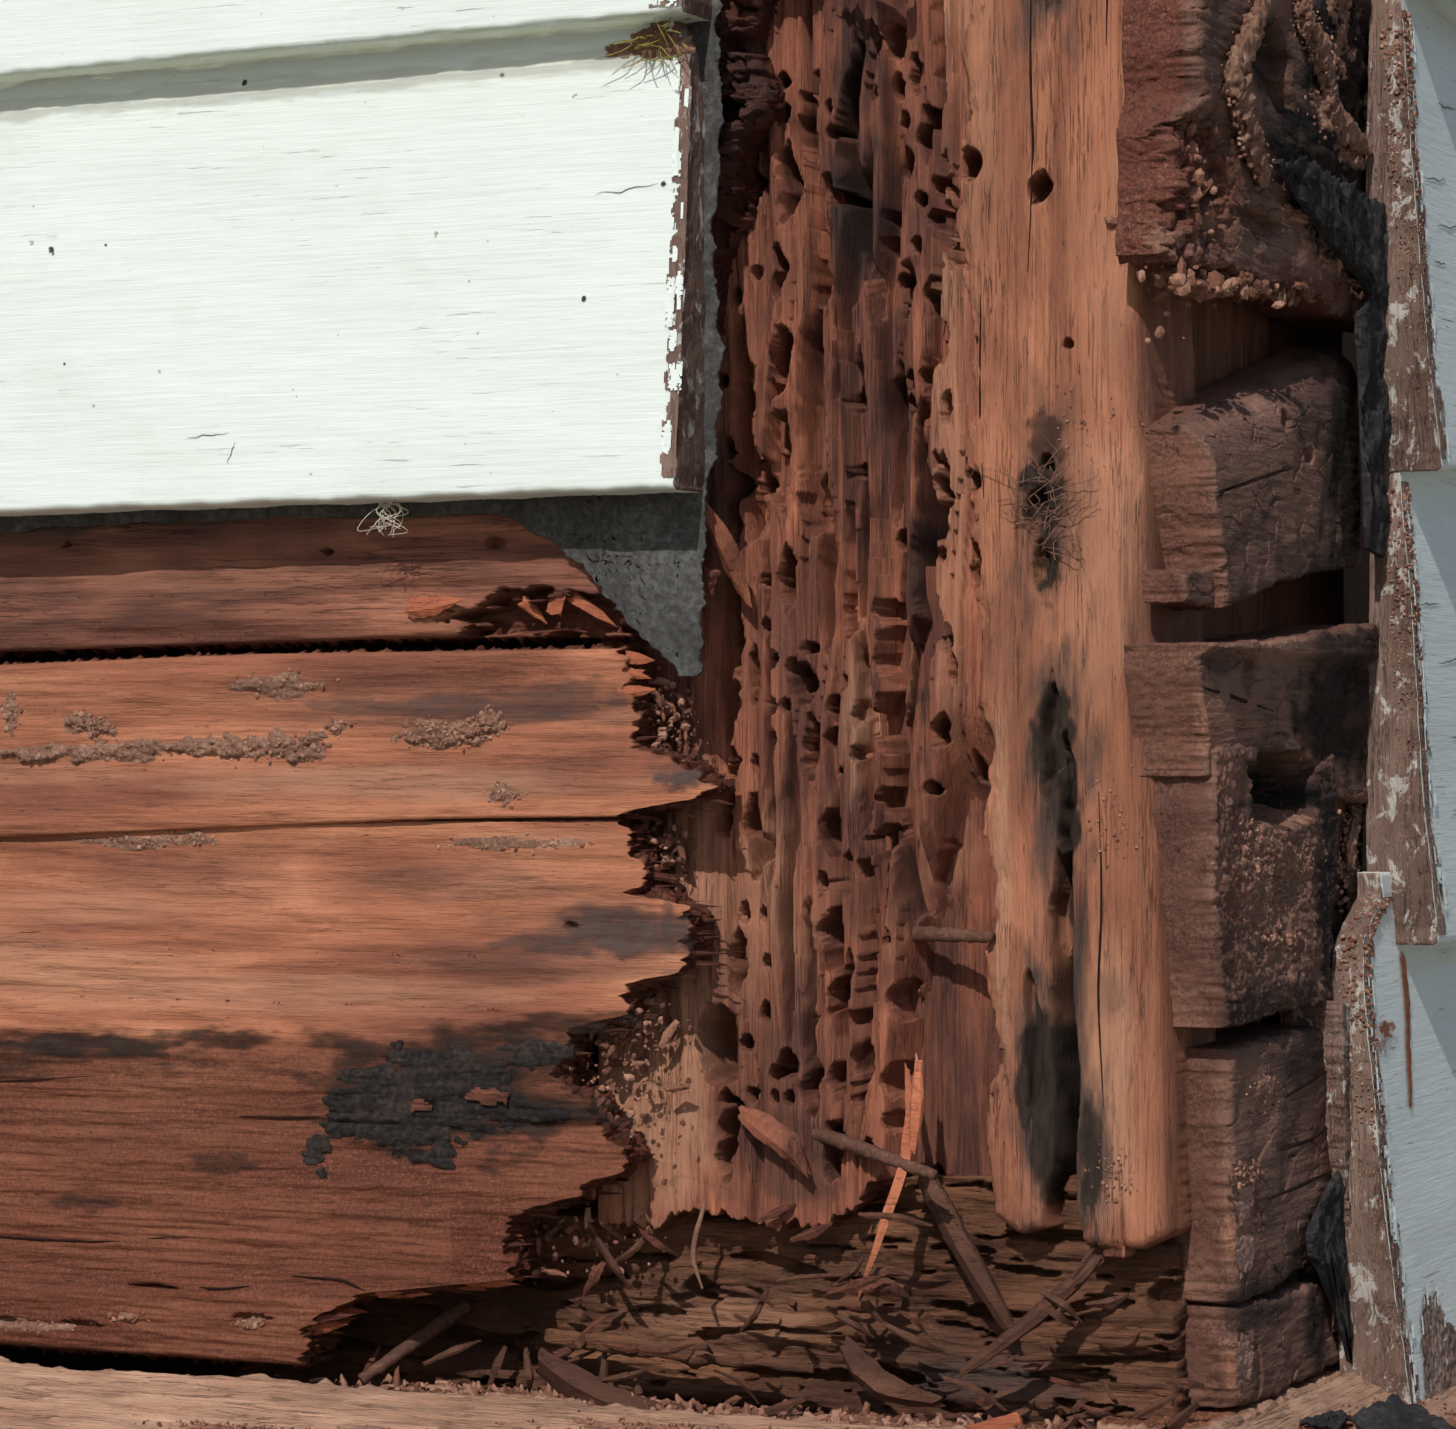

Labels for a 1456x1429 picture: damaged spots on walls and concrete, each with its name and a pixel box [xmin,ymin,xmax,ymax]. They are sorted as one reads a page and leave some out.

peeling [649,0,682,8]
peeling [660,53,692,477]
crack [1217,465,1290,498]
damp [1029,687,1081,925]
peeling [1338,481,1456,1404]
damp [0,1030,264,1073]
damp [301,1012,627,1178]
damp [1015,993,1102,1210]
rust [1379,953,1412,1108]
spalling [1231,1176,1256,1281]
spalling [1235,1329,1254,1386]